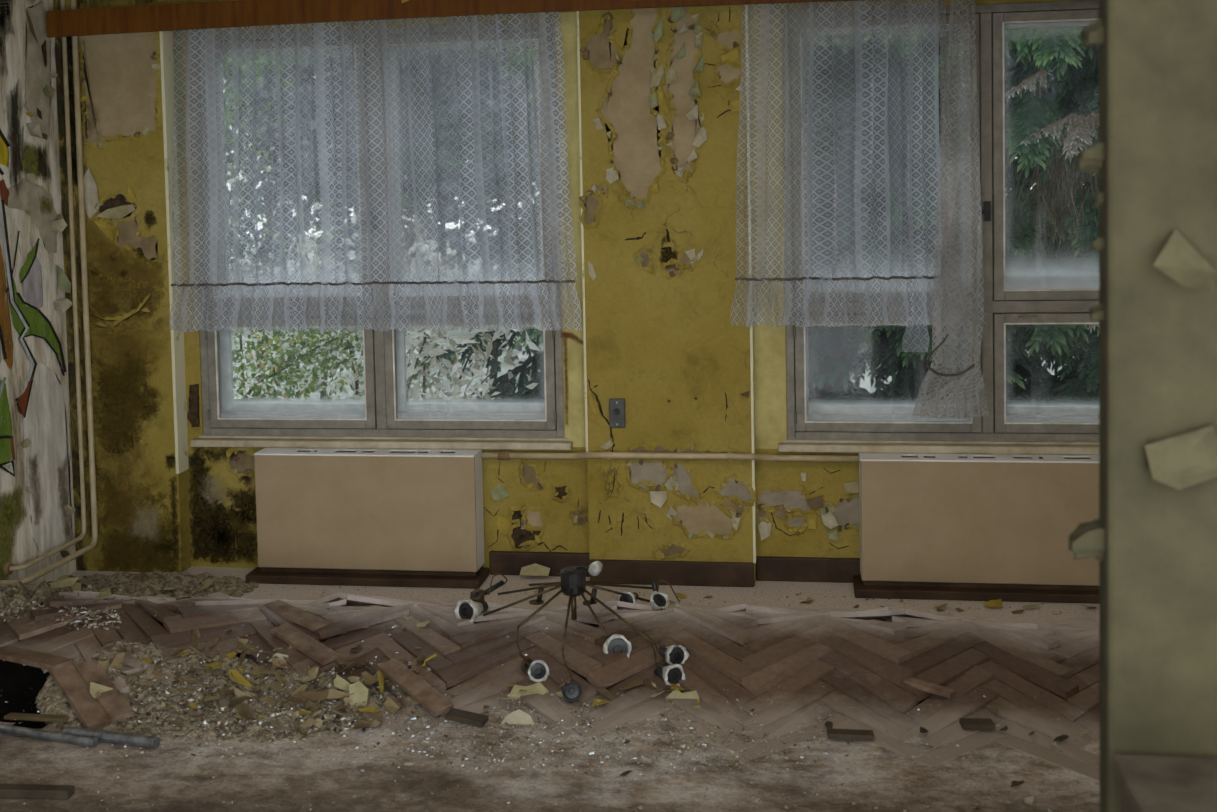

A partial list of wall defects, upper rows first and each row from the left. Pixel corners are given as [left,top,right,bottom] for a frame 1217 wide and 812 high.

leakage [38,36,82,186]
peeling [78,31,162,150]
peeling [579,6,745,229]
peeling [84,168,158,260]
peeling [632,244,703,280]
leakage [75,202,258,572]
leakage [31,459,41,518]
leakage [59,463,71,535]
crack [484,462,571,552]
peeling [491,459,588,552]
crack [571,379,657,536]
peeling [600,440,860,561]